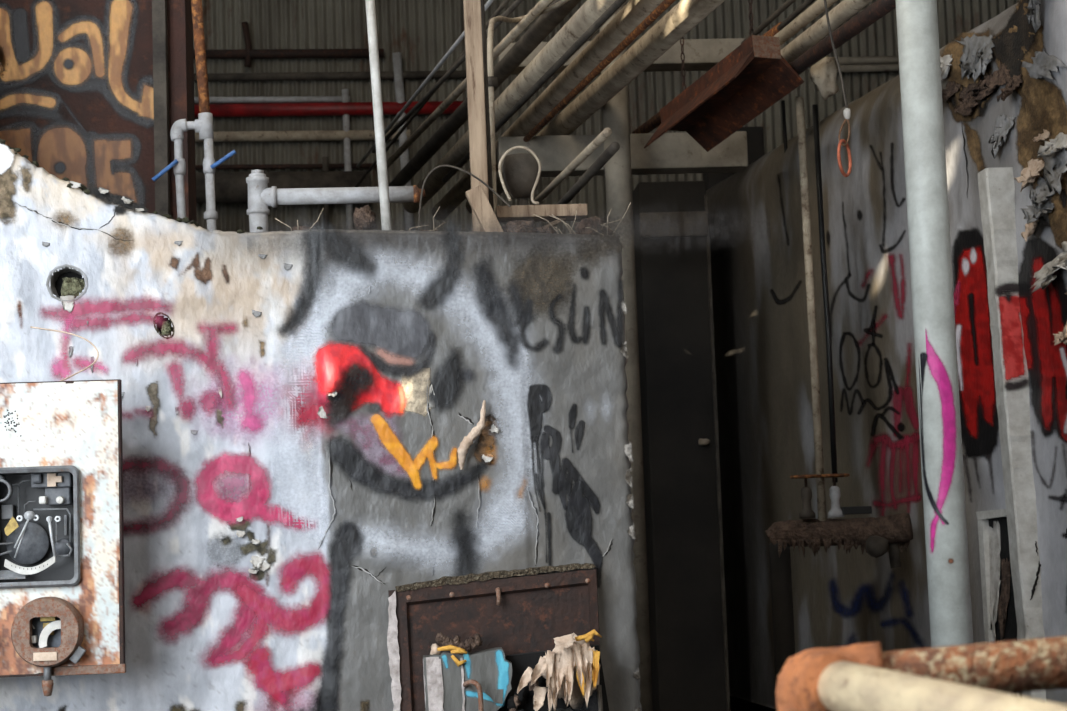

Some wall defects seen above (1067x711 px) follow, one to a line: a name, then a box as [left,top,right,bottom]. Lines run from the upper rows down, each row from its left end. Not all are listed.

peeling [940,0,1067,293]
flaking render [0,167,31,224]
crack [17,203,133,241]
peeling [1053,322,1067,346]
peeling [457,400,499,470]
flaking render [221,516,276,581]